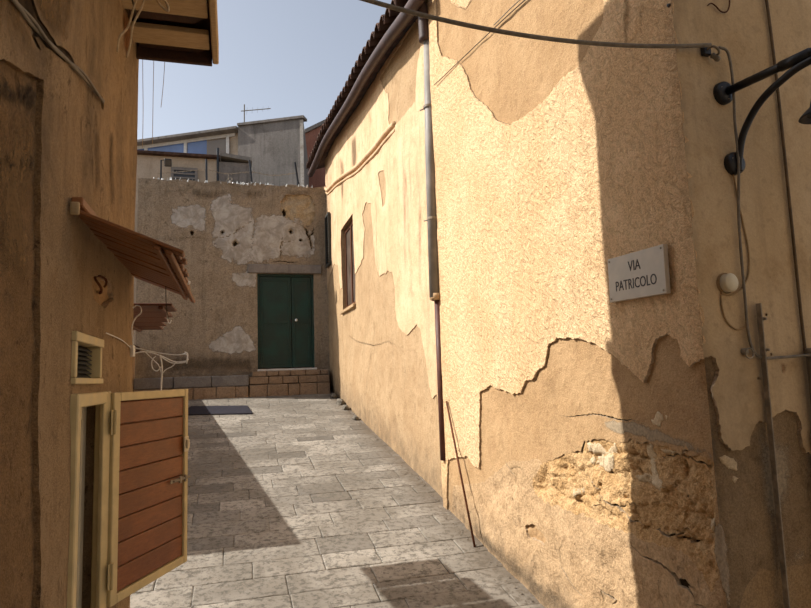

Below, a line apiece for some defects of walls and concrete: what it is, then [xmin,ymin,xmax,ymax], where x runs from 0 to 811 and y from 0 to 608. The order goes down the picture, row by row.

flaking render [380,22,421,125]
flaking render [436,0,604,125]
flaking render [378,170,386,206]
peeling [171,194,316,287]
peeling [209,326,256,354]
flaking render [328,202,811,608]
crack [557,413,644,423]
crack [585,474,701,543]
crack [627,544,699,605]